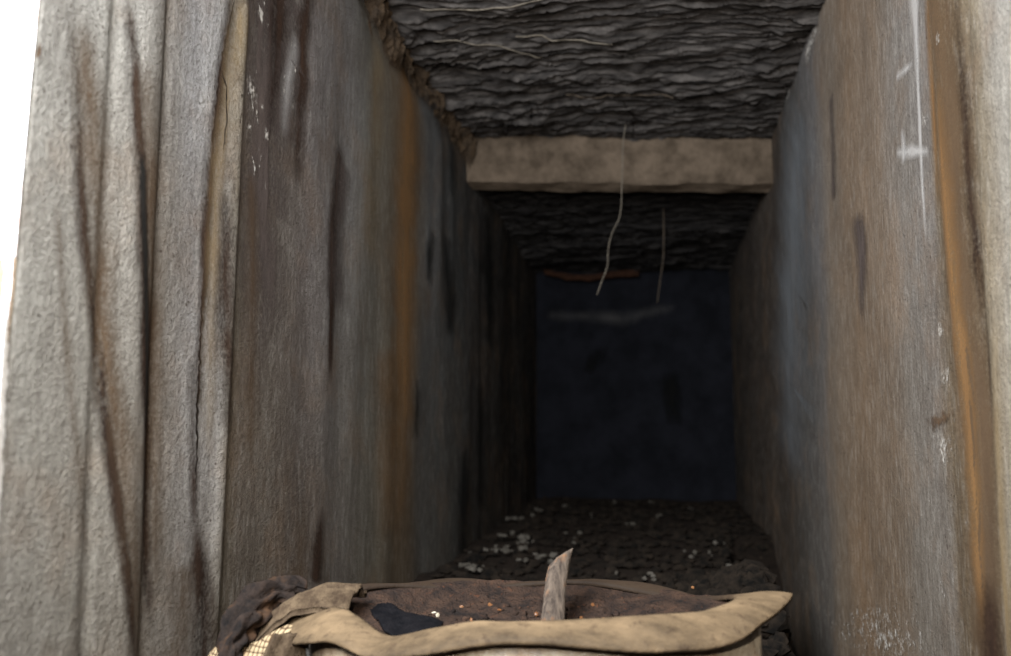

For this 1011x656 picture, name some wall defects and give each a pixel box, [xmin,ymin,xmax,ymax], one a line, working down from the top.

leakage [75,12,158,650]
leakage [219,212,232,385]
leakage [243,0,310,332]
rust [928,0,1000,656]
leakage [179,534,214,656]